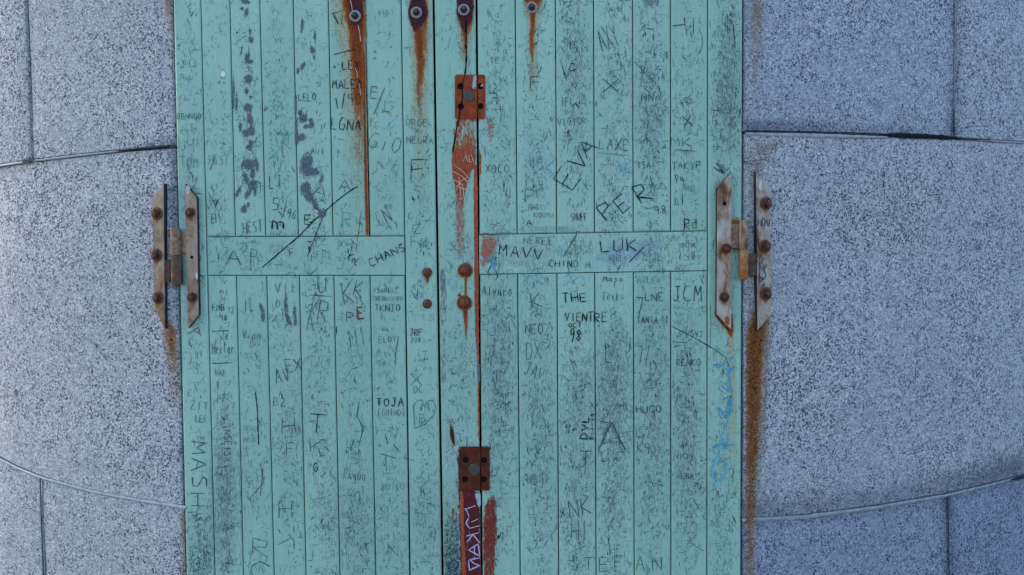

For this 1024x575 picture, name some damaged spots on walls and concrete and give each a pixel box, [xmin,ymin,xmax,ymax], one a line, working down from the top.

corrosion [334,0,369,236]
corrosion [408,0,430,162]
corrosion [456,0,475,57]
corrosion [524,0,543,79]
corrosion [457,263,473,340]
corrosion [714,302,771,573]